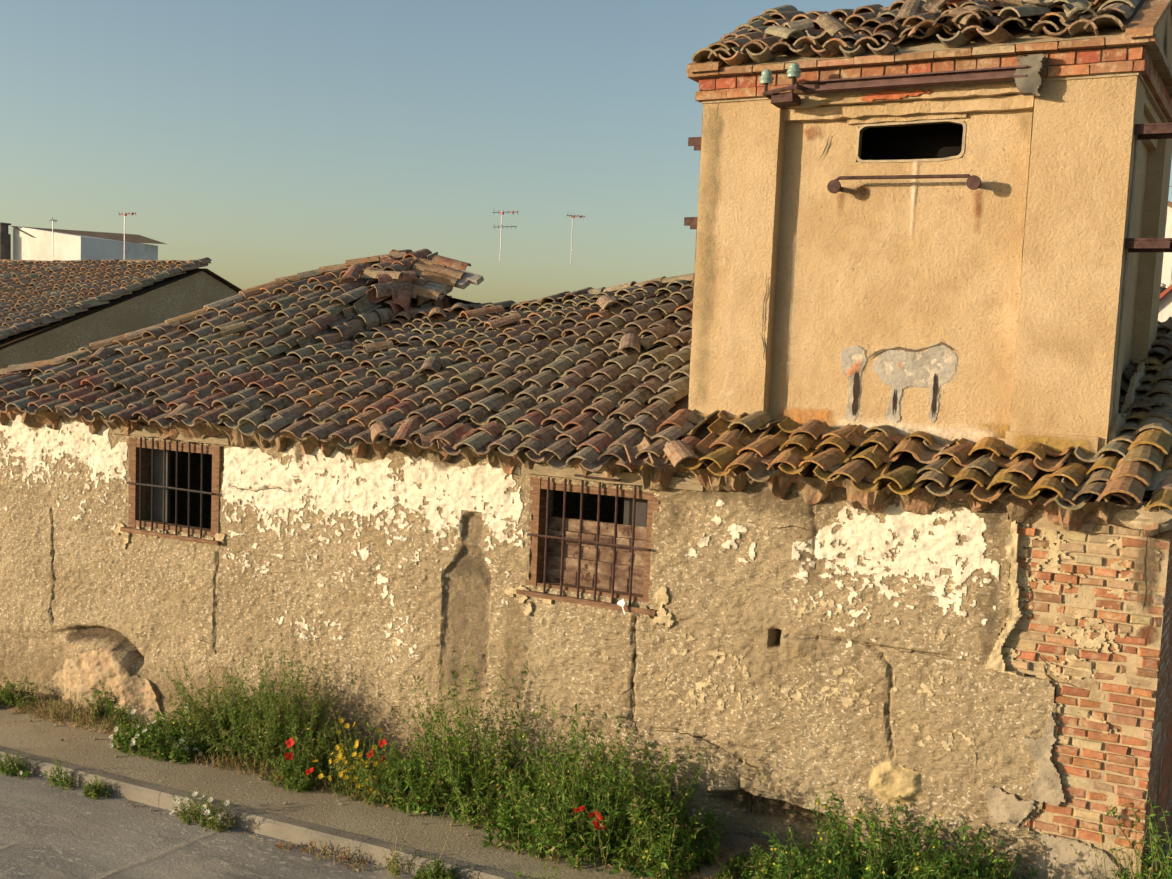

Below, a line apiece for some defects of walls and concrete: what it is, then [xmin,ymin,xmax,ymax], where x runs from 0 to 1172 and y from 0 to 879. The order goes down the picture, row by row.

peeling [0,414,553,695]
crack [616,619,760,809]
spalling [640,586,753,712]
peeling [684,500,756,563]
peeling [771,665,976,765]
crack [791,635,984,756]
peeling [788,501,1086,675]
peeling [1045,635,1095,680]
peeling [1101,537,1160,609]
spalling [1120,625,1155,644]
peeling [985,785,1036,827]